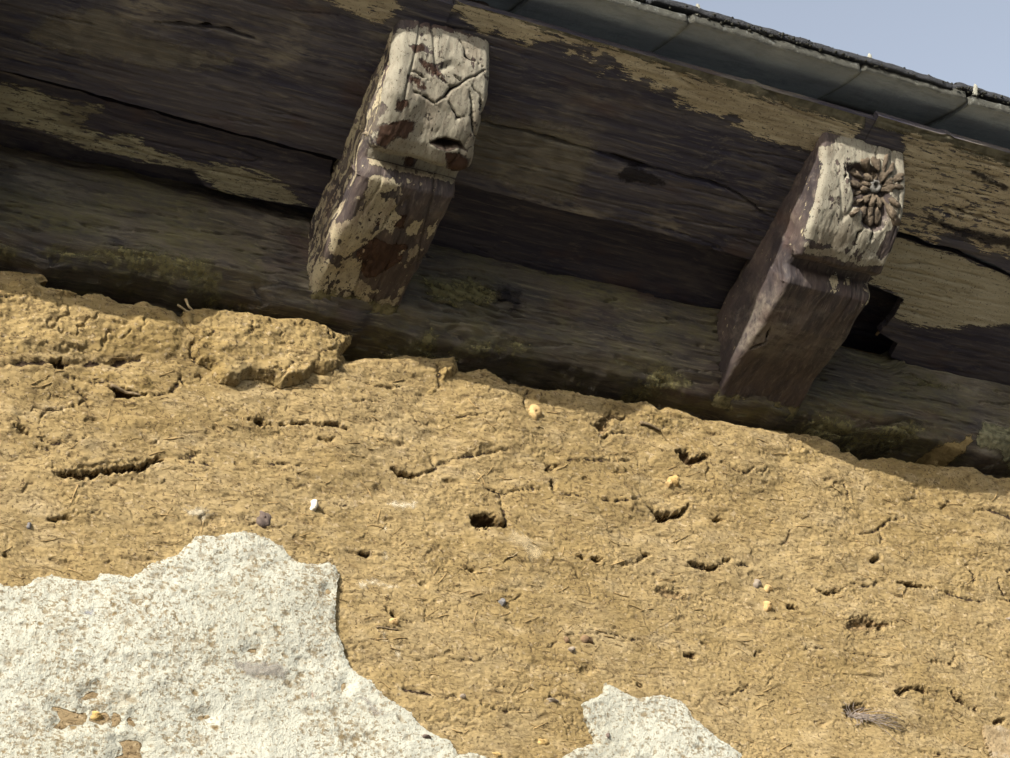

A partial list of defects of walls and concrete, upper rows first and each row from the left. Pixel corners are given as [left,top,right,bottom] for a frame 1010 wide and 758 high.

crack [415,42,484,139]
peeling [0,80,308,207]
peeling [307,0,1010,330]
spalling [112,389,138,399]
spalling [593,415,614,435]
spalling [676,450,708,467]
spalling [59,459,161,481]
spalling [470,514,503,531]
spalling [847,617,889,632]
peeling [52,707,136,730]
spalling [844,705,868,720]
peeling [115,740,142,758]